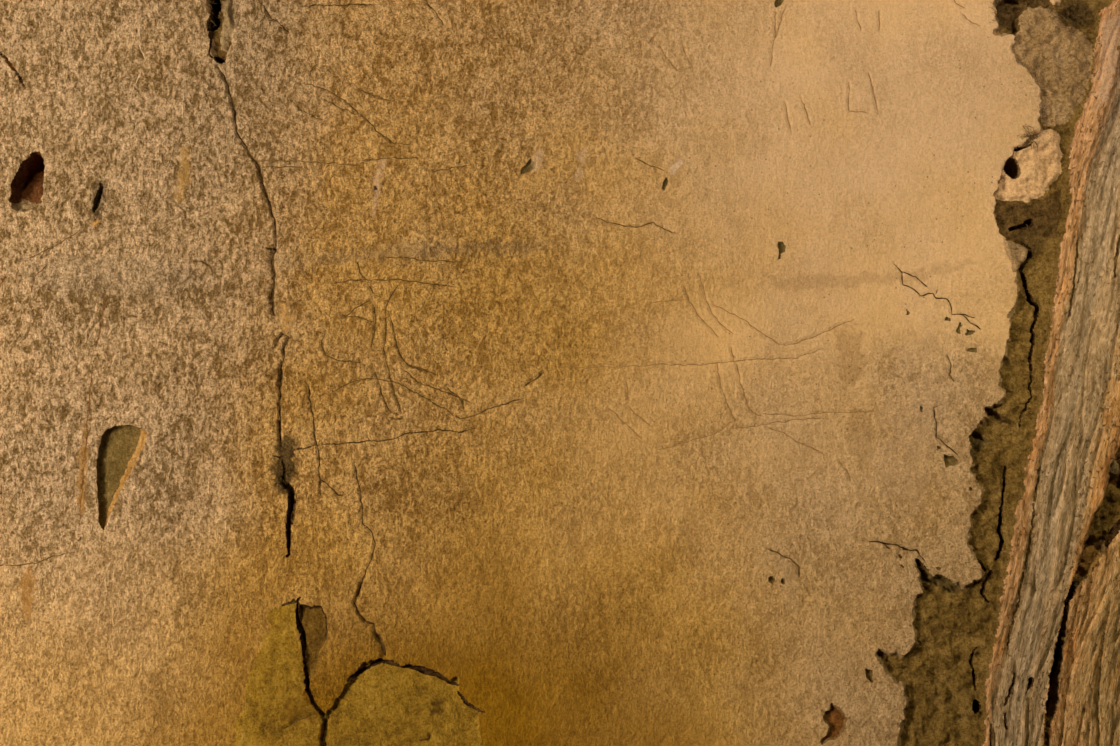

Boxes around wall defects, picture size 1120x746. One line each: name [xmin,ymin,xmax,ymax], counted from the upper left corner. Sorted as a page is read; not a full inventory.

crack [207,0,477,655]
crack [894,264,981,330]
spalling [865,0,1115,746]
spalling [96,425,147,530]
crack [284,713,326,746]
spalling [235,597,485,746]
spalling [820,703,848,745]